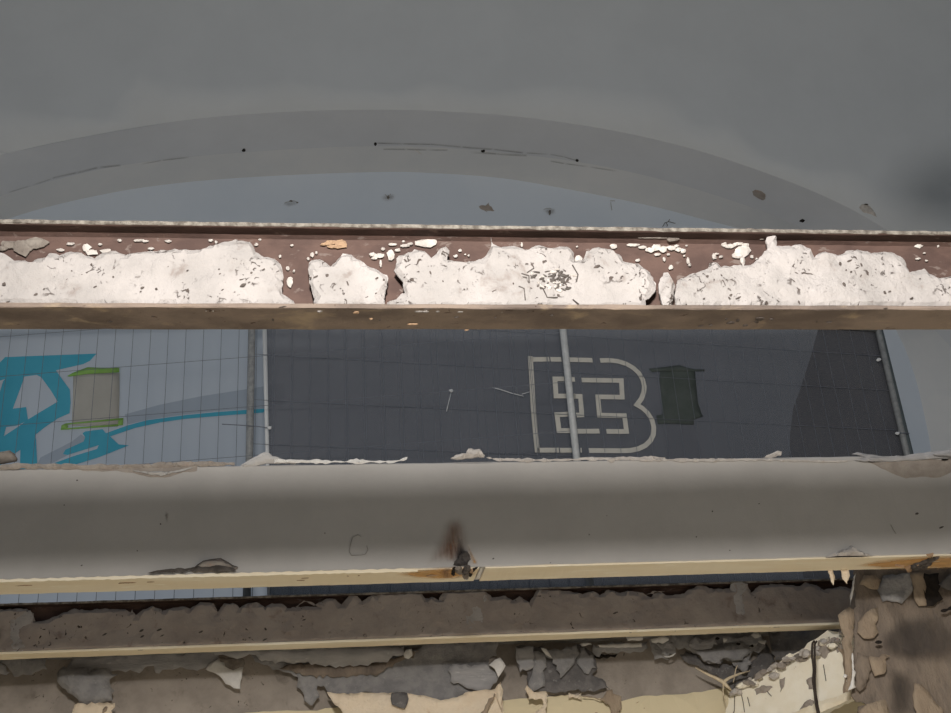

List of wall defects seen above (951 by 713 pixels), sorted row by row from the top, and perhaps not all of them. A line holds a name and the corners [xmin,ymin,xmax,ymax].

peeling [0,240,33,257]
peeling [56,239,122,253]
peeling [307,240,342,260]
peeling [369,240,413,281]
peeling [610,238,691,270]
peeling [712,242,758,266]
spalling [513,270,574,291]
rust [409,529,475,578]
flaking render [205,657,245,689]
flaking render [489,656,506,677]